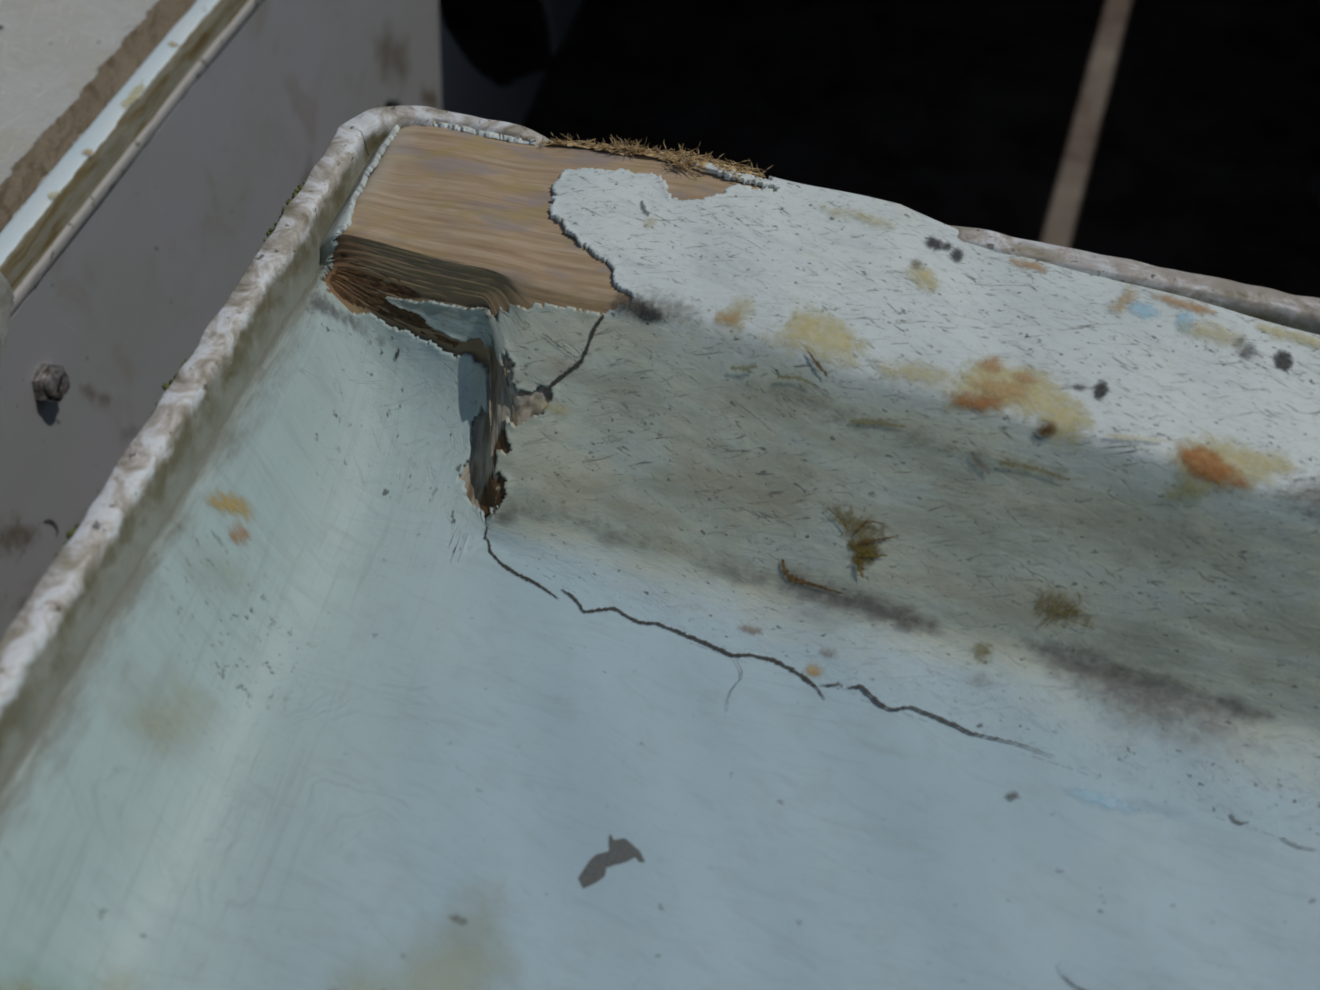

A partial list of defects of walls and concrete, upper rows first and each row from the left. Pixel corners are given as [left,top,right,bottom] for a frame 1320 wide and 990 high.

peeling [312,125,777,519]
crack [543,314,604,389]
rust [785,314,860,377]
rust [954,357,1091,440]
rust [1176,439,1292,494]
crack [484,527,1053,756]
peeling [579,834,645,888]